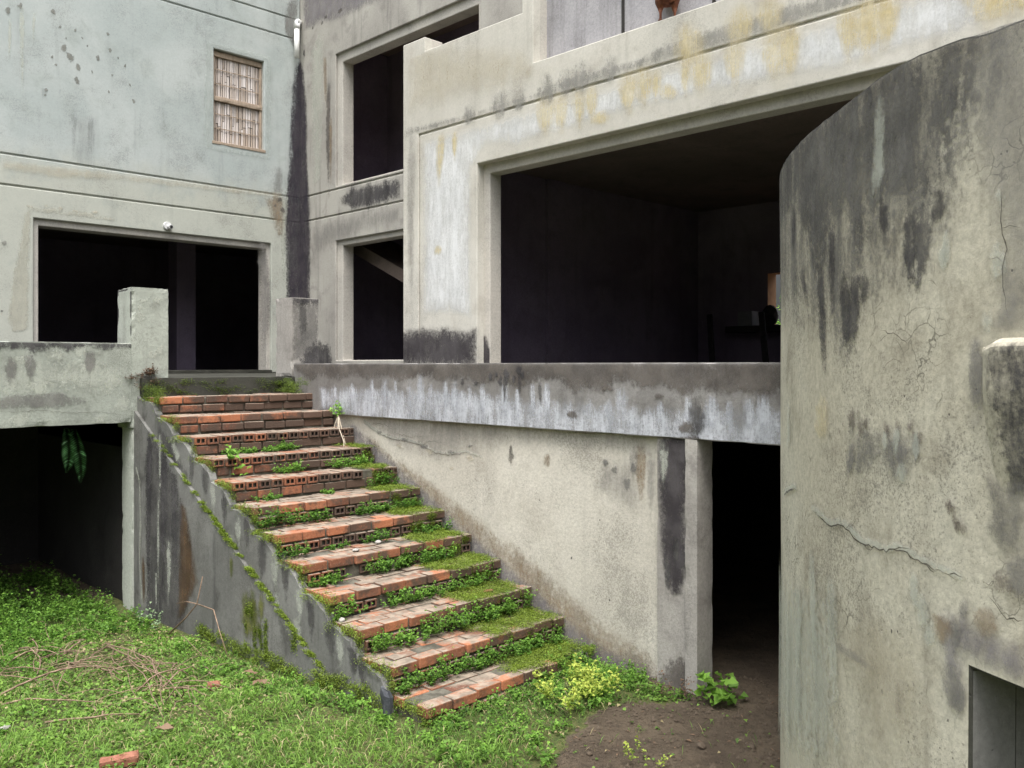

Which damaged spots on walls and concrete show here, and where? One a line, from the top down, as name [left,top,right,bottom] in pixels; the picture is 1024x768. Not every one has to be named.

water stain [537,0,849,99]
water stain [779,25,1007,355]
crack [993,190,1020,310]
water stain [268,0,789,690]
water stain [842,411,922,479]
crack [816,512,1023,622]